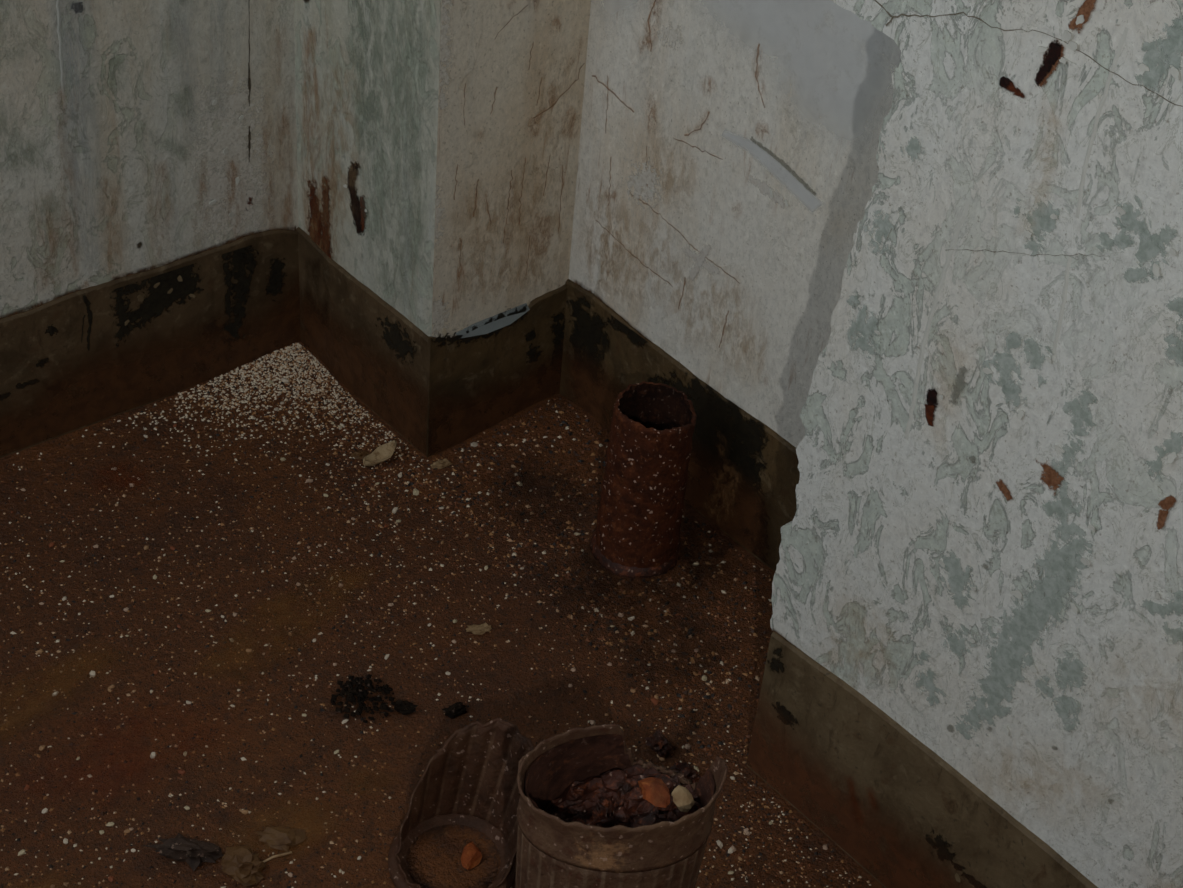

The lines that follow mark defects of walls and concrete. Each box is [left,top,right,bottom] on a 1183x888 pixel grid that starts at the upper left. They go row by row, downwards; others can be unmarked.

rust [999,76,1024,98]
rust [307,176,333,259]
rust [996,479,1013,501]
rust [1036,460,1064,495]
rust [1156,495,1176,530]